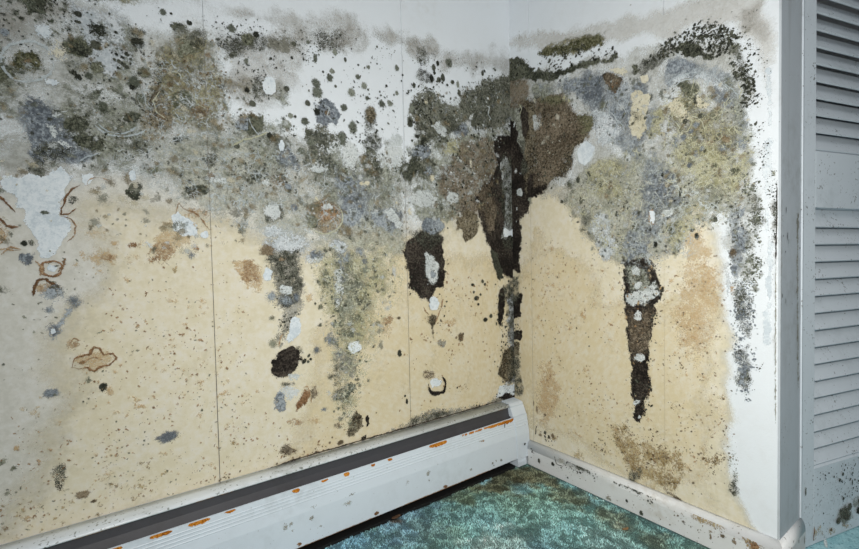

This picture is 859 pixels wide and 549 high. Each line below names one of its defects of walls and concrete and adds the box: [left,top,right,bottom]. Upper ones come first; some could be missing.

leakage [311,18,352,63]
leakage [348,74,371,101]
peeling [0,166,108,265]
leakage [767,170,786,421]
rust [462,418,514,442]
leakage [817,457,859,528]